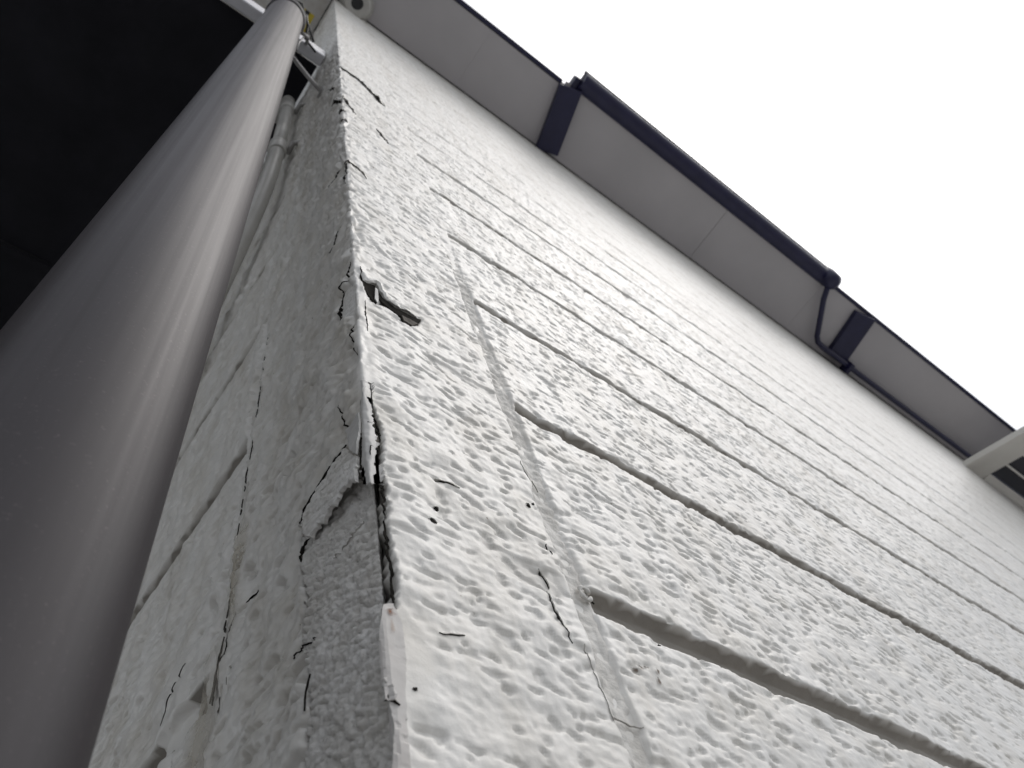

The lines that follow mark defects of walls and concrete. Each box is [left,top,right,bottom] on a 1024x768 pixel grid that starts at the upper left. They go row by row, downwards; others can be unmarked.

crack [343,159,367,184]
crack [339,66,388,144]
peeling [337,262,421,355]
crack [209,338,268,706]
spalling [293,379,401,768]
crack [538,544,644,729]